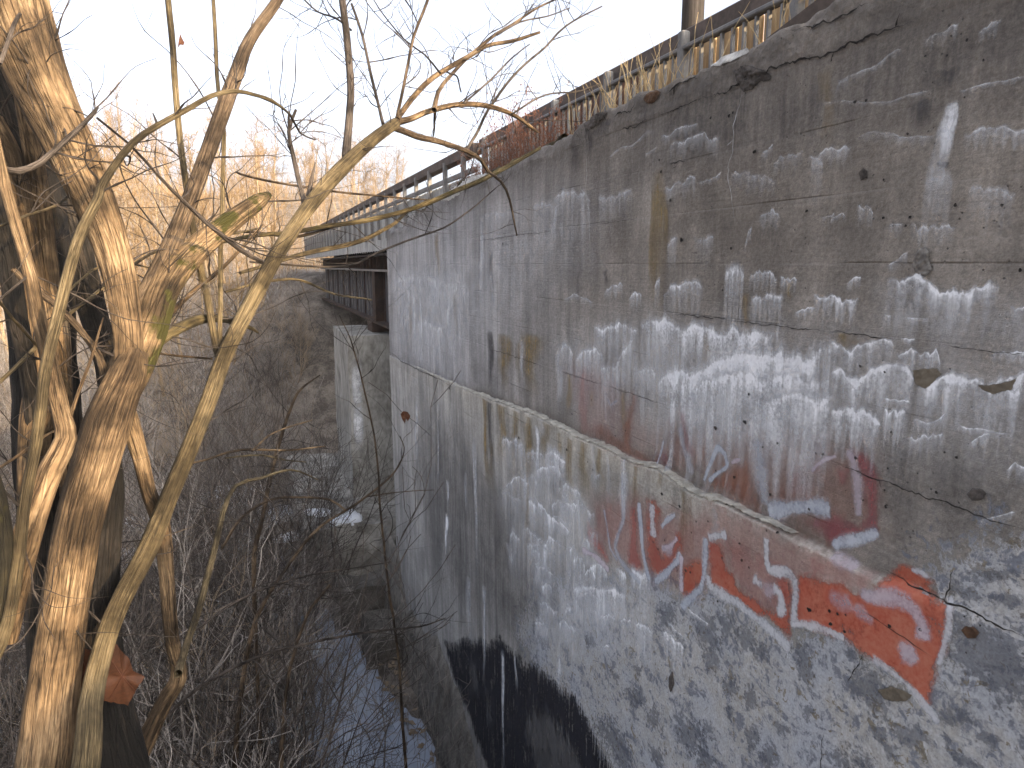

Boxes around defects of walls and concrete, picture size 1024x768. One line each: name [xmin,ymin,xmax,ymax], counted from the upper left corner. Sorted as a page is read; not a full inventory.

spalling [711,48,771,92]
crack [616,3,914,207]
water stain [941,104,957,149]
water stain [726,266,796,283]
water stain [796,295,856,313]
water stain [893,273,994,309]
water stain [561,316,1024,444]
spalling [913,368,941,389]
spalling [978,378,1016,394]
crack [832,463,1023,529]
water stain [488,403,687,655]
crack [892,571,1022,636]